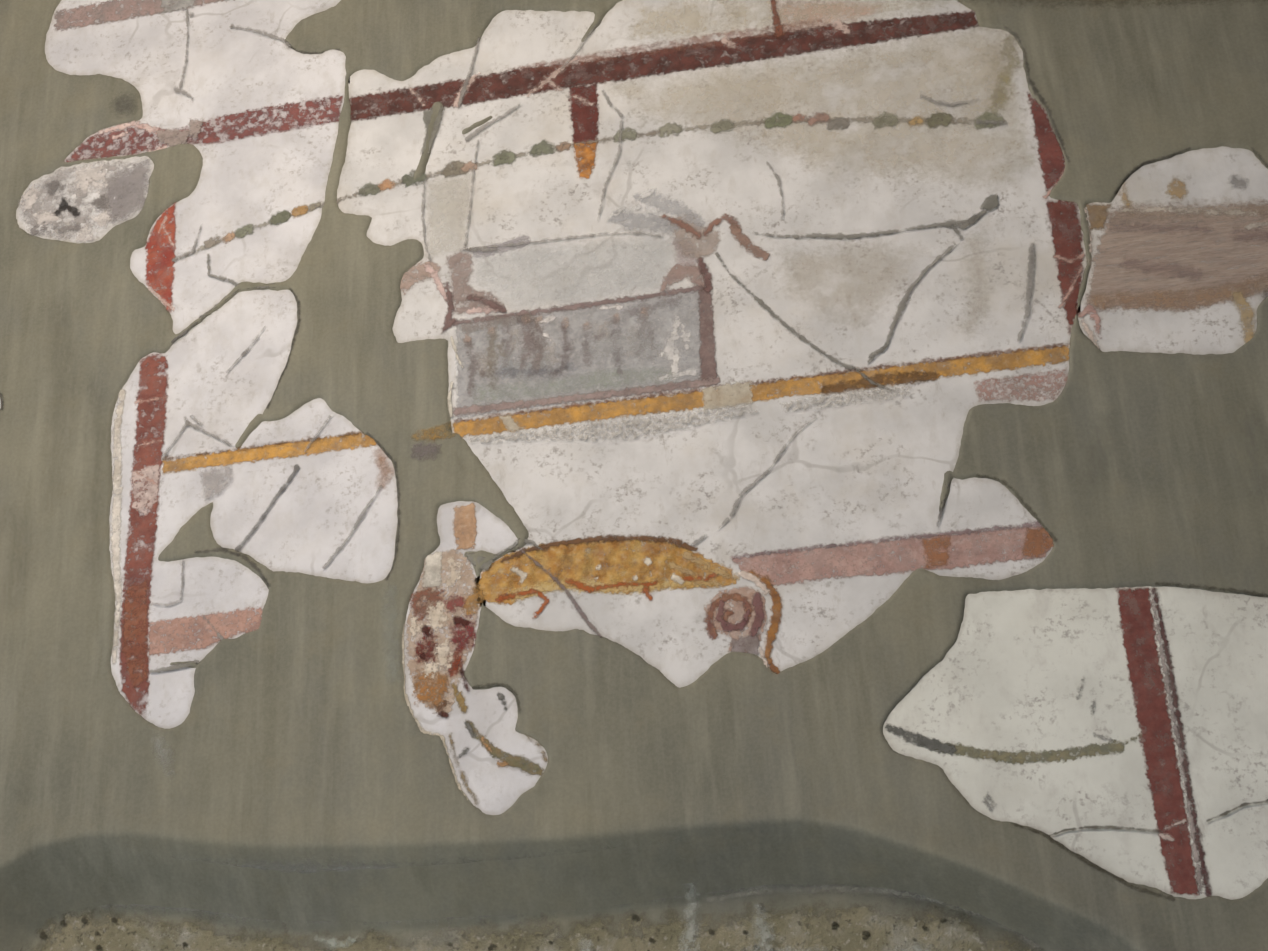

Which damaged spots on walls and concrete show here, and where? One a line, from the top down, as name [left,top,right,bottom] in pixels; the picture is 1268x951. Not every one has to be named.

flaking render [421,106,444,154]
crack [458,38,661,252]
crack [715,162,994,391]
crack [1018,243,1035,340]
crack [156,415,331,606]
crack [323,433,400,579]
crack [692,422,809,544]
crack [984,476,1057,542]
crack [493,538,602,638]
crack [150,660,199,672]
crack [1207,799,1268,821]
flaking render [32,903,1032,951]